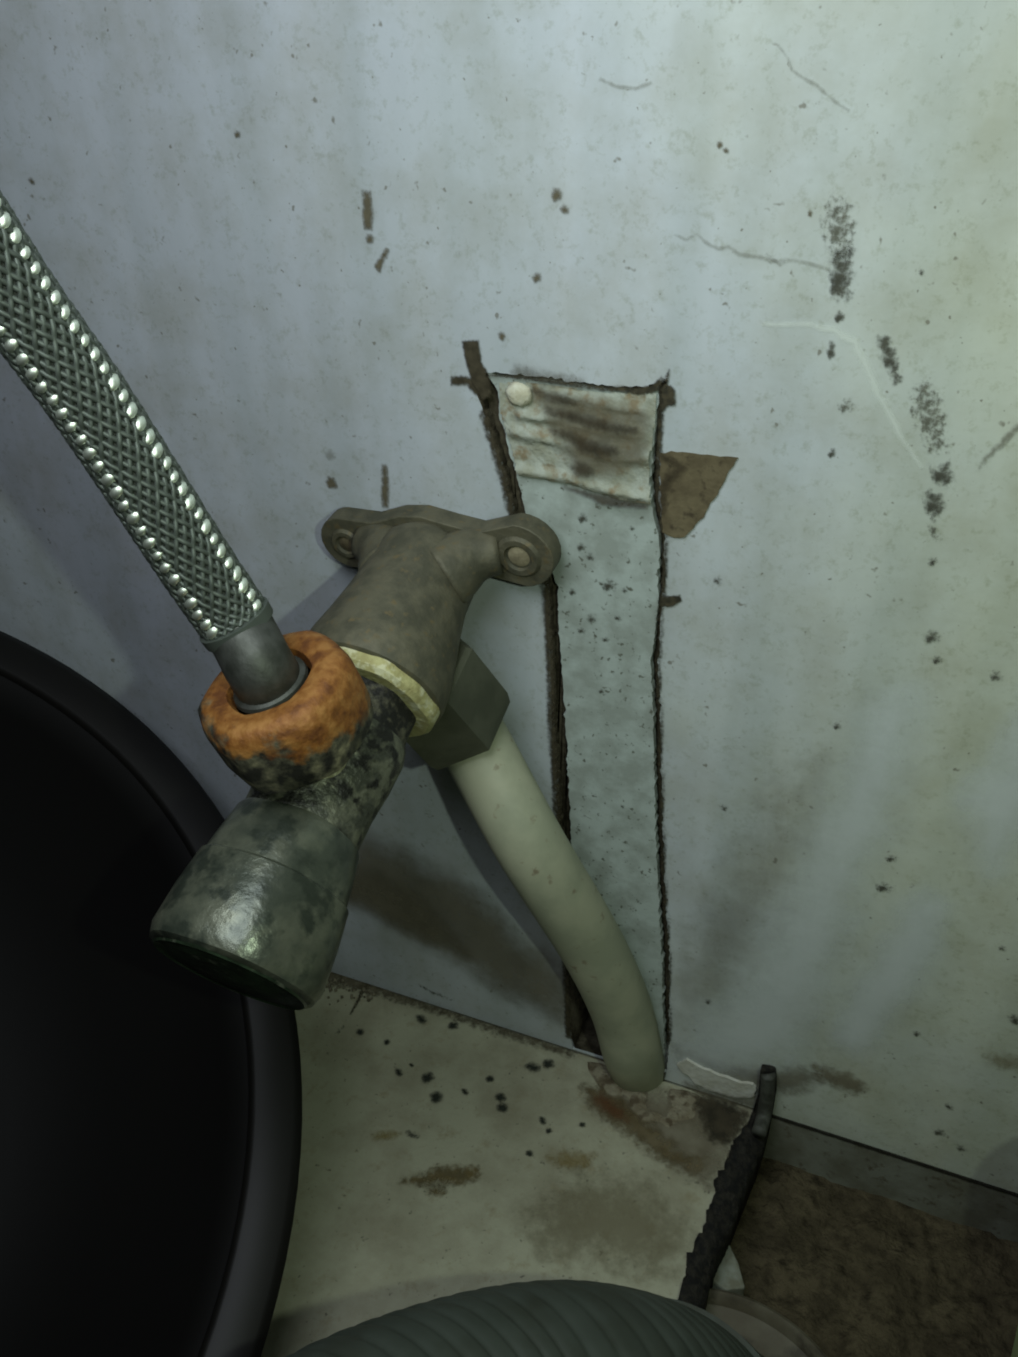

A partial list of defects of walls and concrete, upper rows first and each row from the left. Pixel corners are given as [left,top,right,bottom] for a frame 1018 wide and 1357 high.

water stain [824,205,854,296]
water stain [880,337,901,383]
water stain [910,385,945,452]
flaking render [499,381,738,538]
water stain [927,462,951,534]